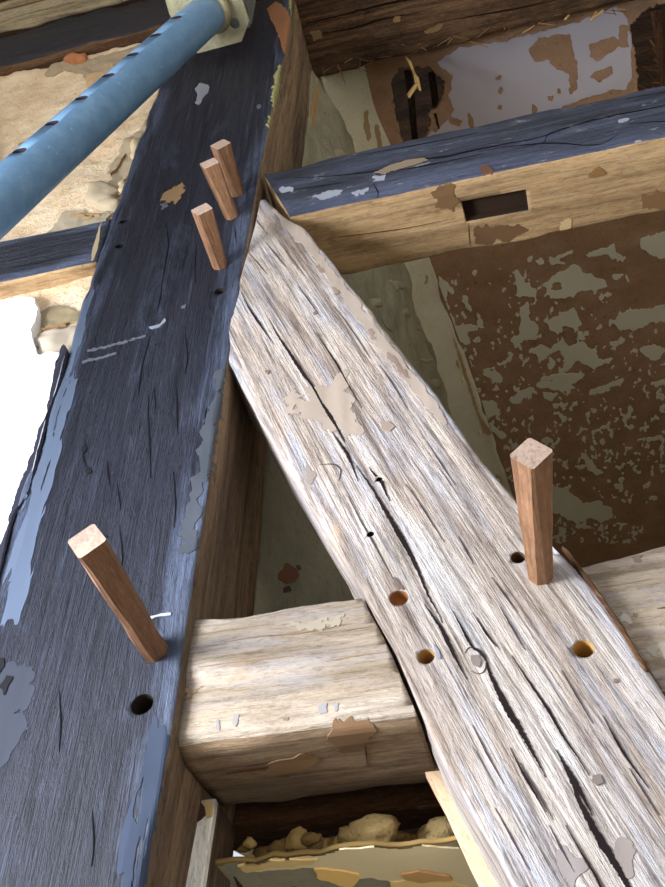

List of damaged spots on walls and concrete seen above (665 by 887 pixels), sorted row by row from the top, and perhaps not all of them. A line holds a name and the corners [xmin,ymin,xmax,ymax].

peeling [363,110,382,148]
peeling [427,6,632,137]
peeling [452,337,492,436]
spalling [177,368,227,554]
crack [240,292,631,887]
hole [0,658,13,695]
crack [561,670,658,814]